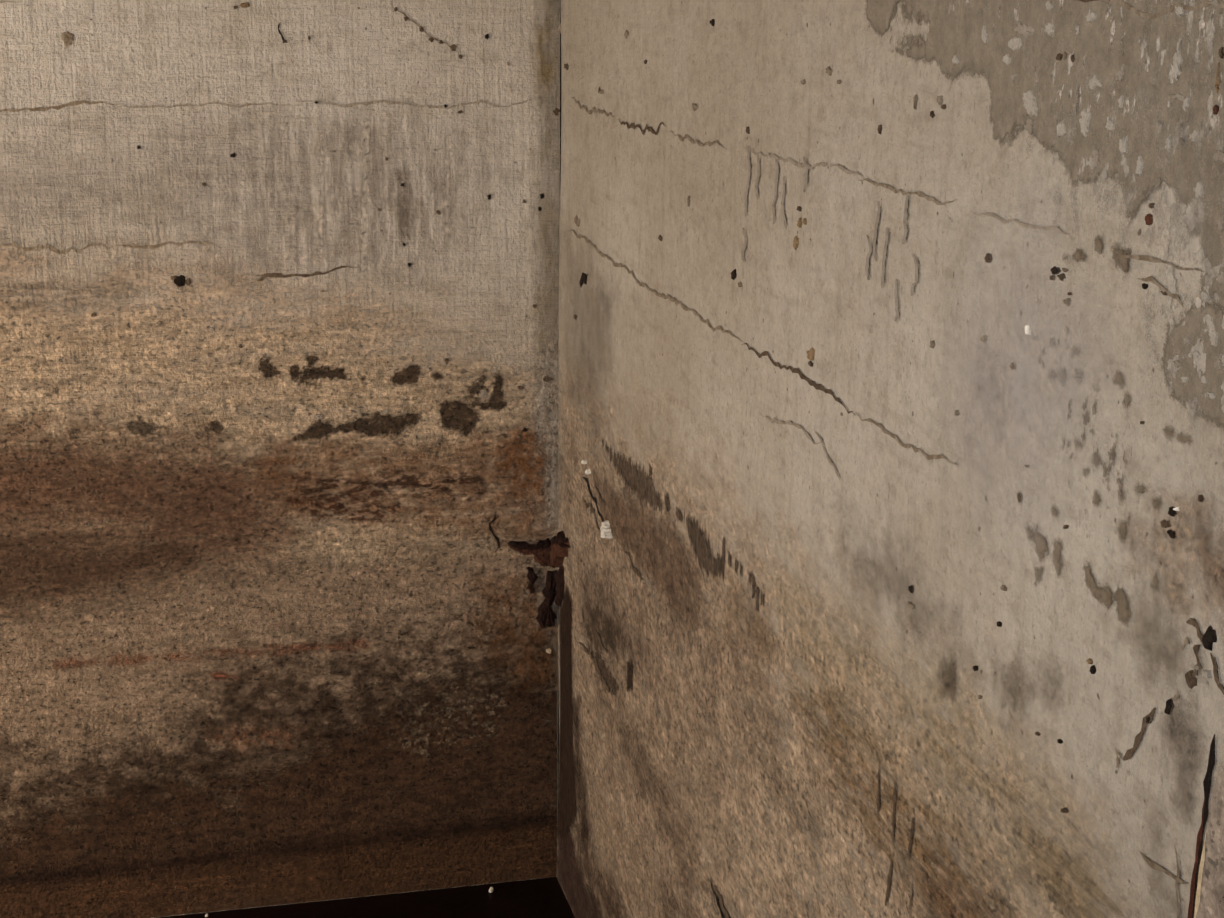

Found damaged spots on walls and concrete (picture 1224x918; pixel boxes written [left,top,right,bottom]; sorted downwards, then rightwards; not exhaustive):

crack [392,7,463,59]
crack [0,99,539,112]
peeling [866,0,1224,427]
peeling [259,355,347,385]
peeling [292,409,420,440]
peeling [391,365,442,385]
peeling [439,373,506,436]
crack [568,230,958,465]
peeling [605,444,764,610]
water stain [0,282,1025,918]
crack [1139,734,1215,918]
crack [711,883,730,918]